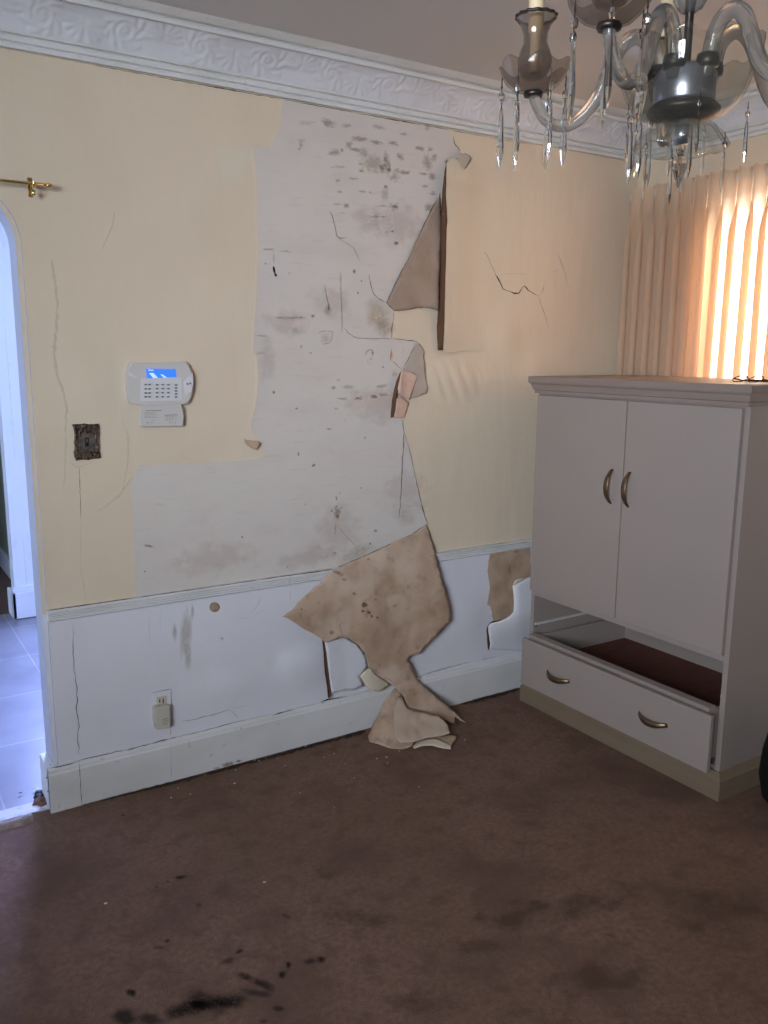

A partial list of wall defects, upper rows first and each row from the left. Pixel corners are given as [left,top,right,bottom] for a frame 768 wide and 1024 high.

crack [486,254,548,326]
peeling [129,99,471,724]
peeling [487,548,531,621]
crack [52,649,247,801]